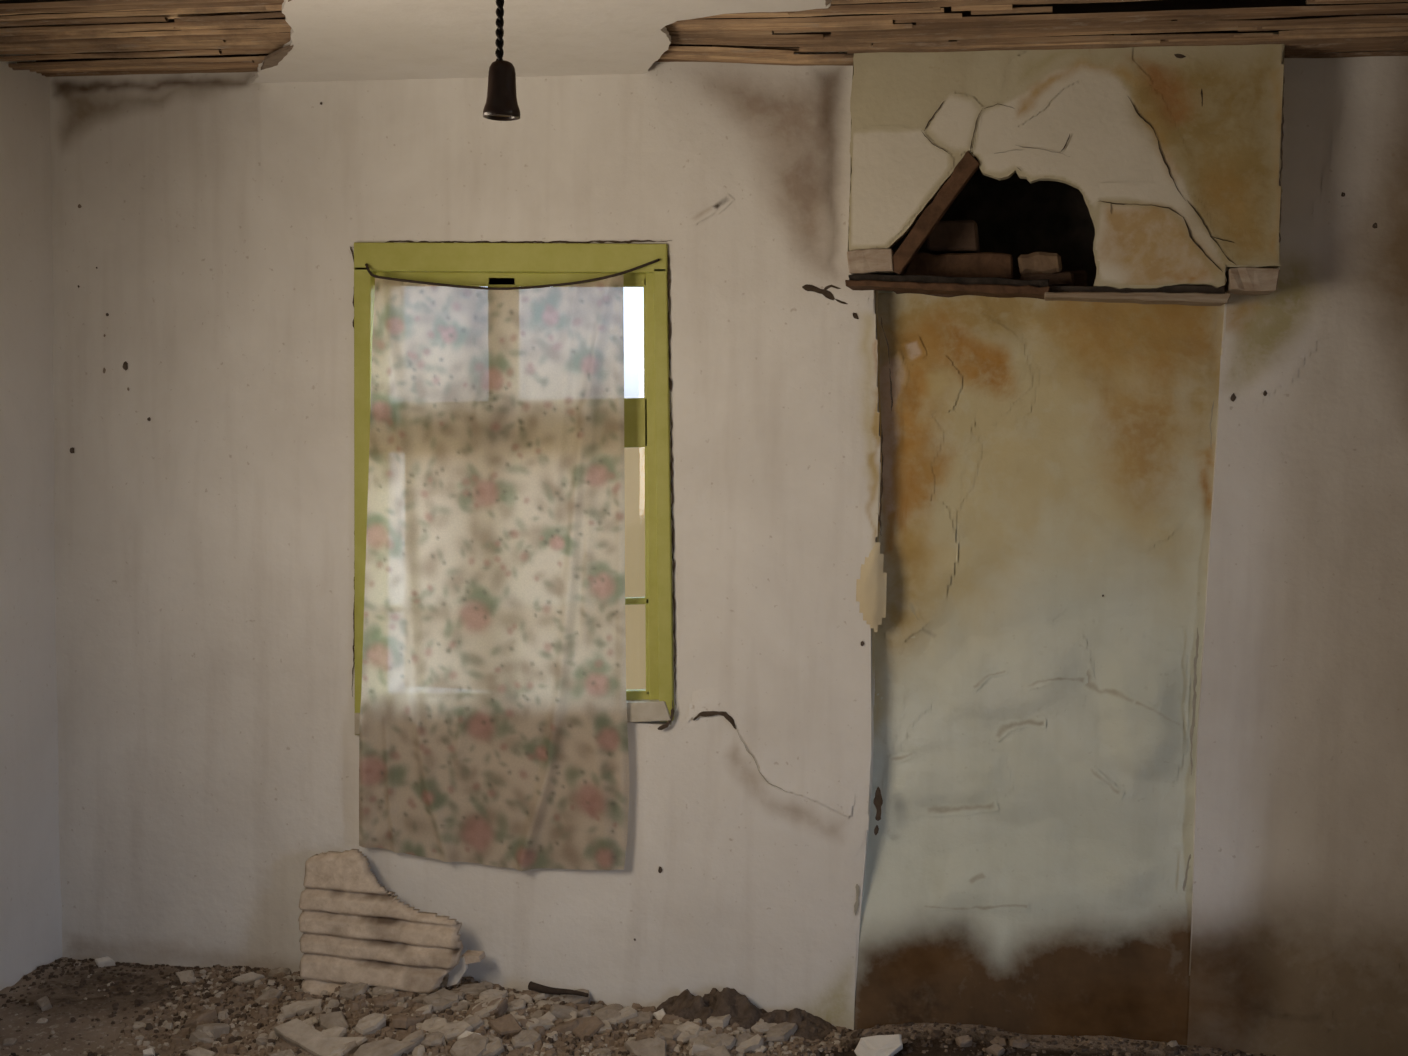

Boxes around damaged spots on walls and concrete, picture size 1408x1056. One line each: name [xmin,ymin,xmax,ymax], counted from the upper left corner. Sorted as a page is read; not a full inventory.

flaking render [261,45,293,70]
leakage [787,52,853,297]
peeling [921,91,984,156]
peeling [1095,224,1149,286]
crack [1102,98,1235,272]
leakage [873,32,1322,769]